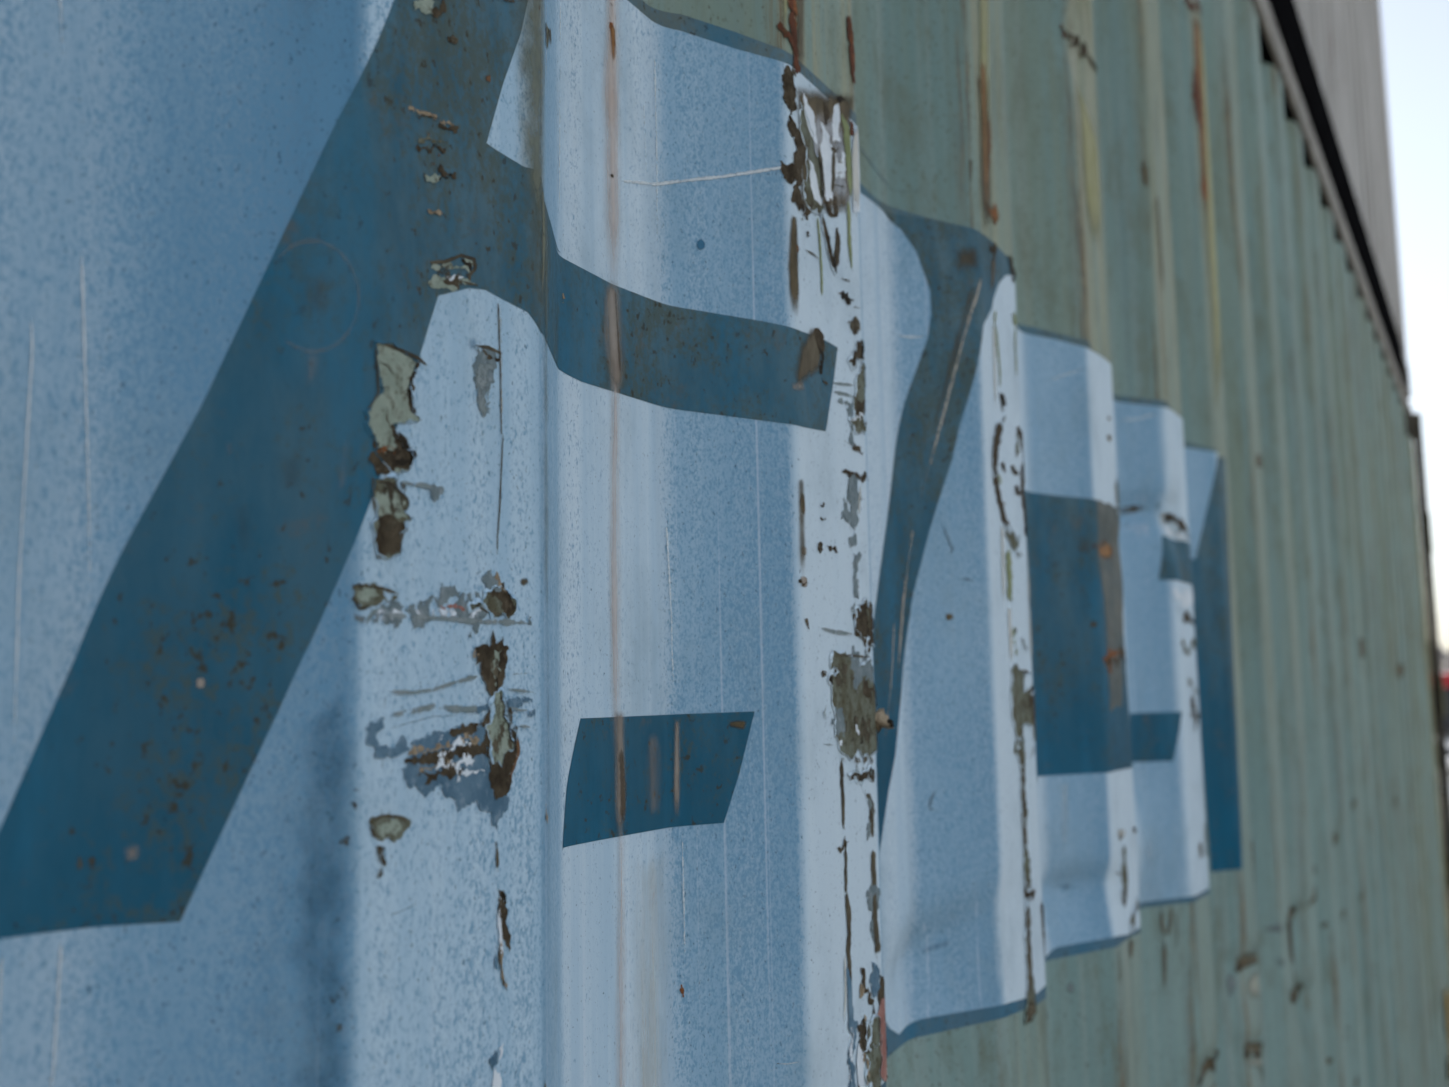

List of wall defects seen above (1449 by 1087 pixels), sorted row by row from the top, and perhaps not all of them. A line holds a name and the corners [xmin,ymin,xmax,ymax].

peeling [414,0,447,18]
corrosion [608,0,617,239]
corrosion [777,0,804,74]
corrosion [970,0,999,224]
peeling [780,63,867,455]
peeling [363,340,444,560]
corrosion [608,288,621,455]
peeling [352,570,536,831]
corrosion [617,715,626,822]
peeling [805,469,878,786]
peeling [991,393,1036,749]